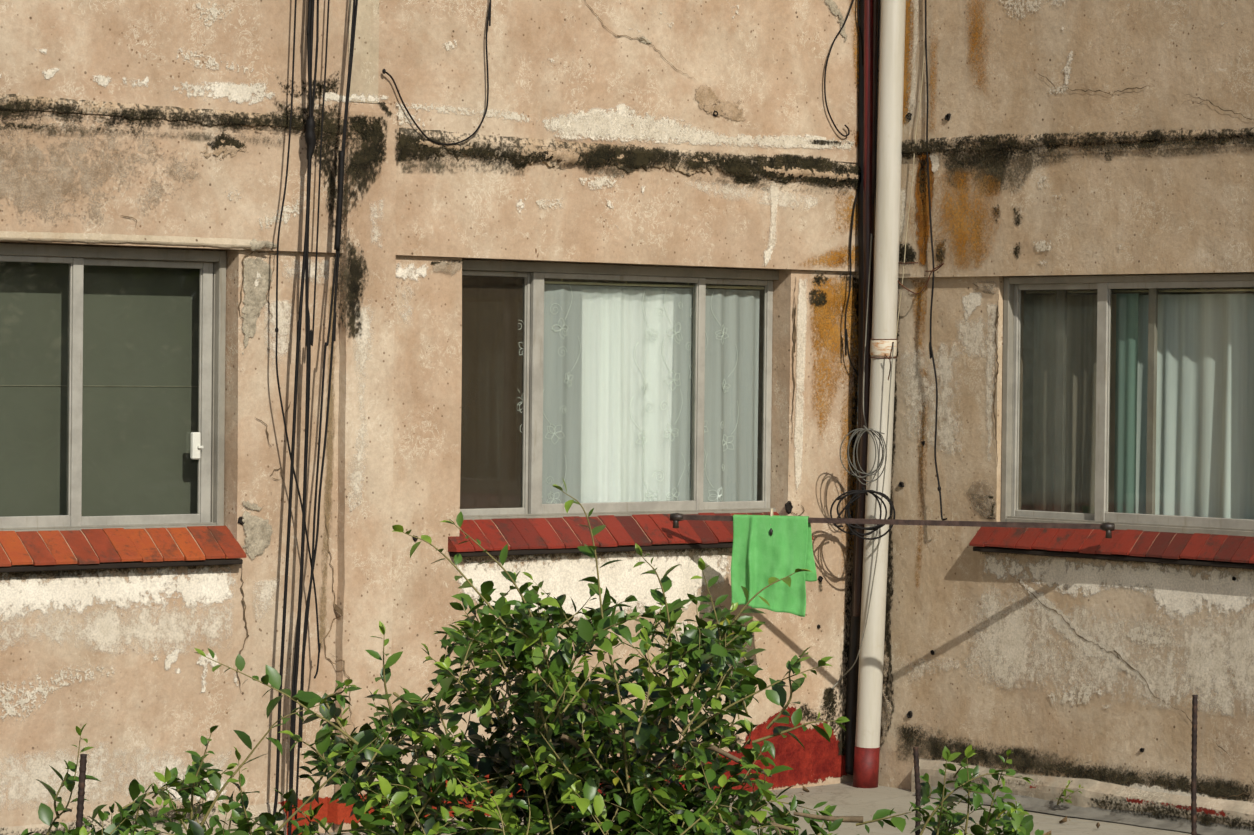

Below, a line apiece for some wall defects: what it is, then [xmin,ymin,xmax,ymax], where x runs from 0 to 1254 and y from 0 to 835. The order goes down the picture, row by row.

crack [585,0,695,79]
rust [903,0,914,122]
leakage [0,74,862,337]
rust [837,195,858,229]
leakage [901,129,1254,226]
rust [804,245,859,589]
peeling [0,566,235,692]
crack [237,575,249,690]
peeling [458,550,730,644]
leakage [880,280,1254,831]
peeling [912,556,1254,835]
crack [1012,576,1192,723]